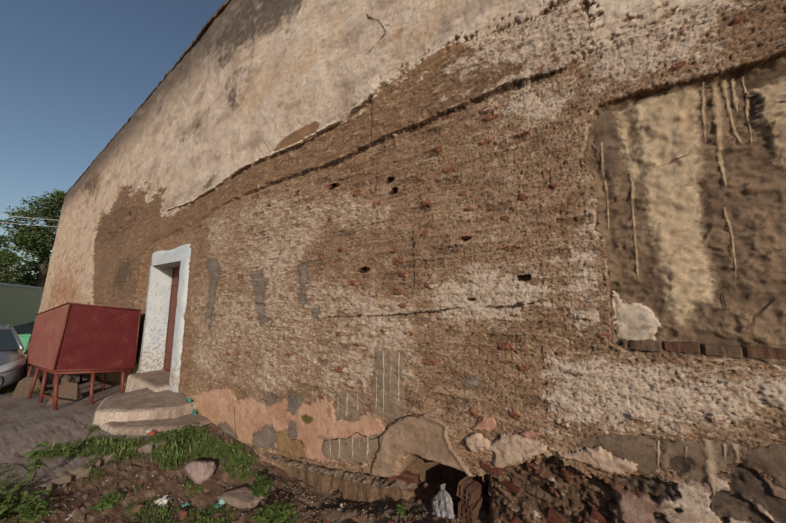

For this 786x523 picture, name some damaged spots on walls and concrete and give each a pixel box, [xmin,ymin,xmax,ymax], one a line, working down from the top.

flaking render [166,90,377,211]
crack [246,69,564,193]
water stain [722,76,752,145]
water stain [601,142,609,229]
flaking render [95,205,140,249]
water stain [630,172,639,279]
crack [329,307,461,317]
crack [486,299,547,308]
flaking render [615,475,684,513]
flaking render [669,456,695,476]
water stain [703,439,740,496]
flaking render [711,463,786,523]